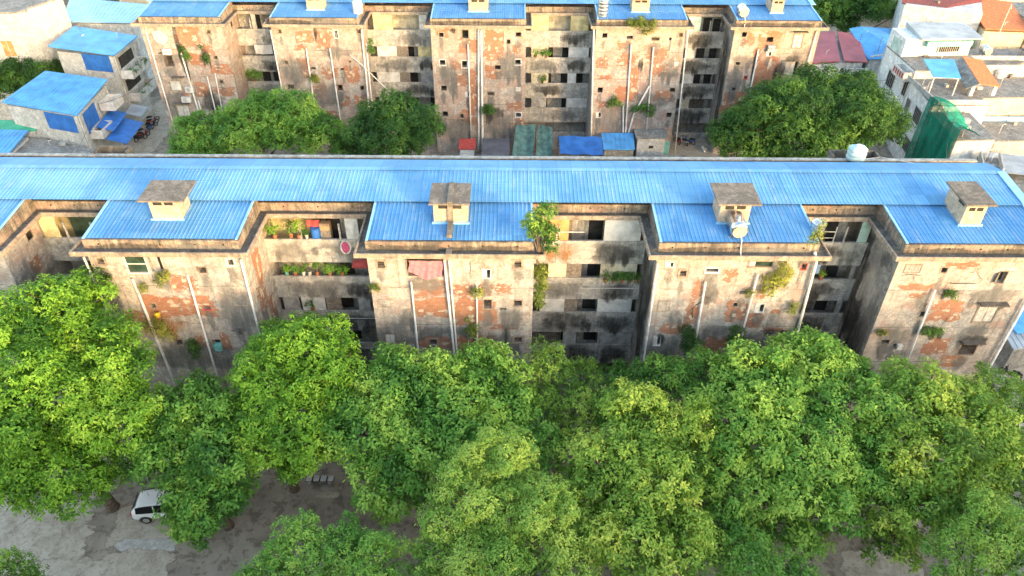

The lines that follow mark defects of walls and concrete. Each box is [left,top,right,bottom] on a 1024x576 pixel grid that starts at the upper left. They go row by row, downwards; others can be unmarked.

flaking render [174,27,235,106]
flaking render [292,28,367,118]
flaking render [435,28,525,126]
leakage [536,86,560,96]
leakage [535,61,585,73]
flaking render [595,40,669,108]
leakage [637,23,810,127]
flaking render [719,31,783,115]
flaking render [120,275,220,327]
flaking render [410,279,520,352]
flaking render [659,277,710,335]
leakage [544,245,833,365]